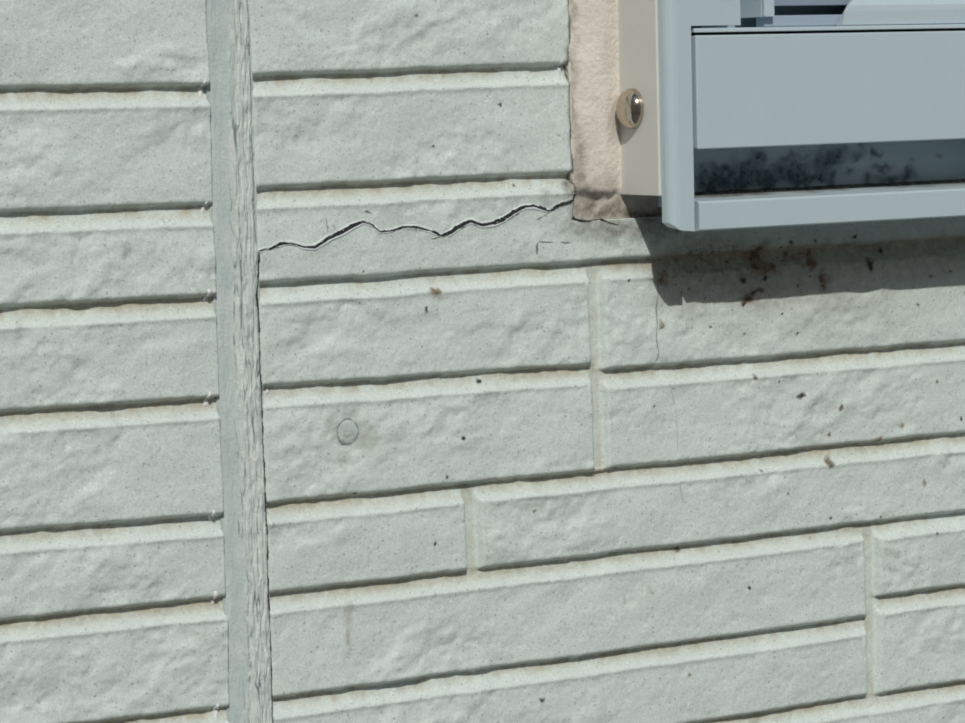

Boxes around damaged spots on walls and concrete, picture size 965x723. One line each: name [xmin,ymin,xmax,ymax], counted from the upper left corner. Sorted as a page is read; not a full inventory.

crack [229,0,618,723]